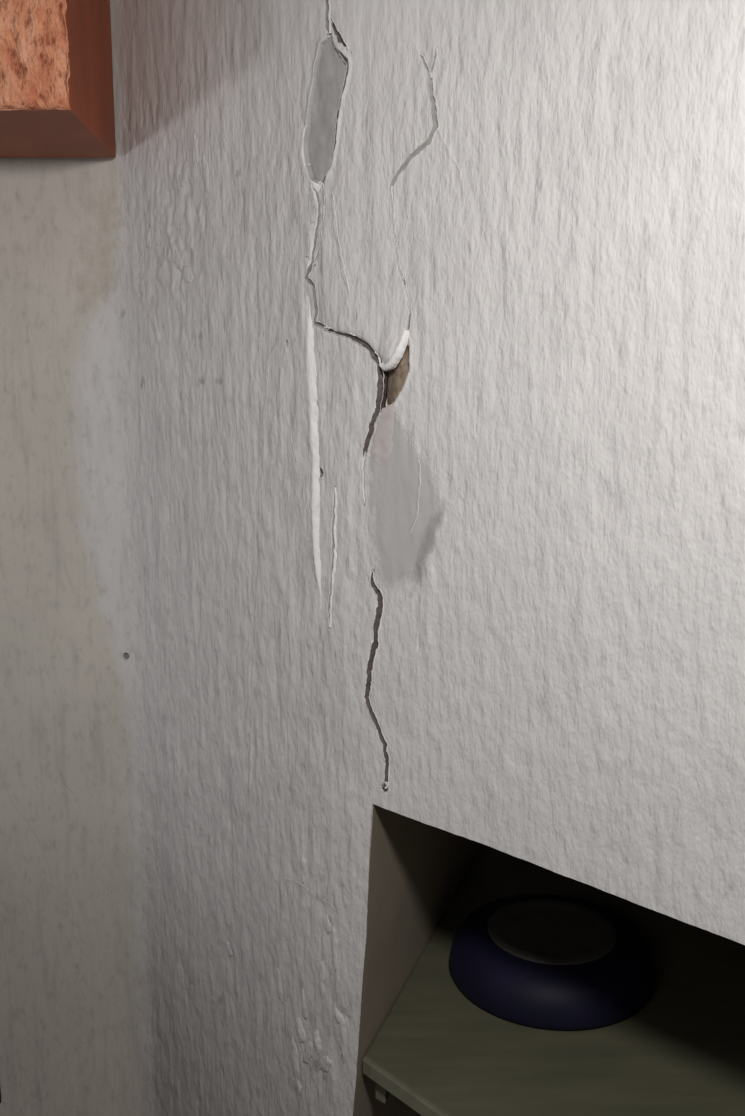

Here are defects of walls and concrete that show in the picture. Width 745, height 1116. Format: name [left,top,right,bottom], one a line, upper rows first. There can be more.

crack [325,0,351,54]
crack [389,47,465,221]
flaking render [297,33,415,466]
crack [327,487,337,627]
crack [359,572,390,795]